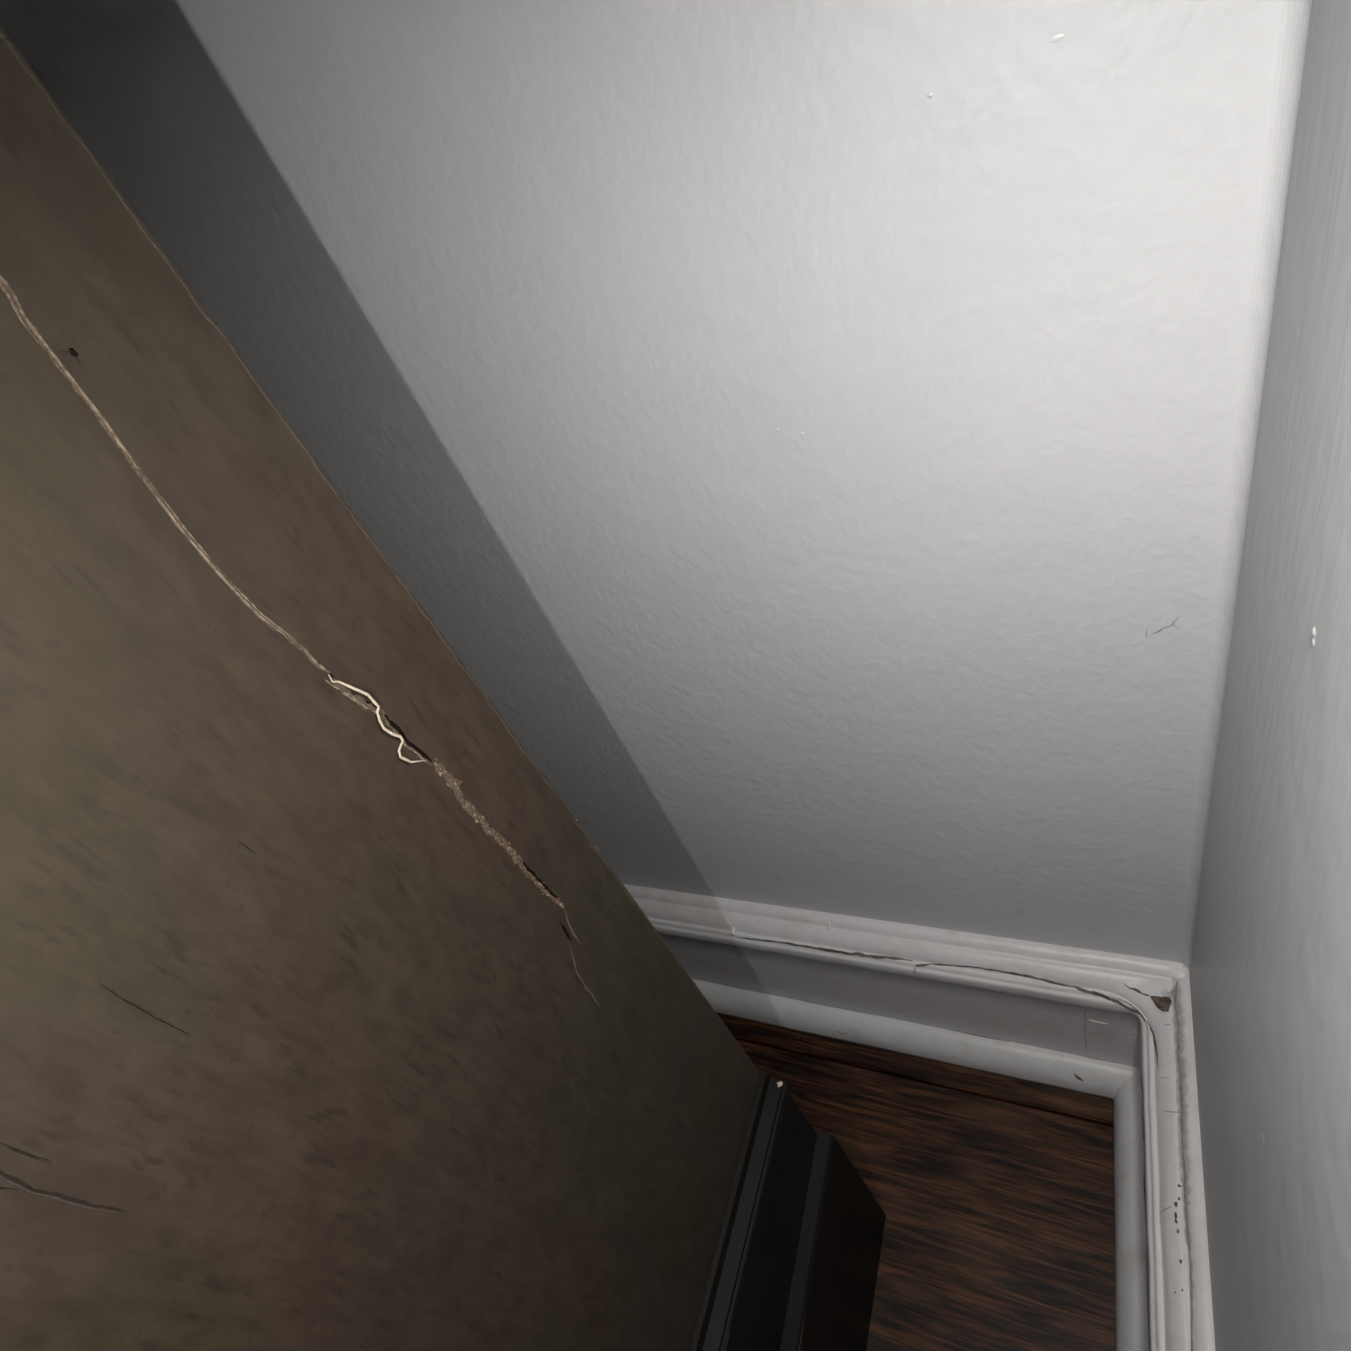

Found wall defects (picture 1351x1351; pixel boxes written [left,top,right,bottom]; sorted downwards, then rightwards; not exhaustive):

crack [0,275,600,1007]
crack [736,937,1193,1351]